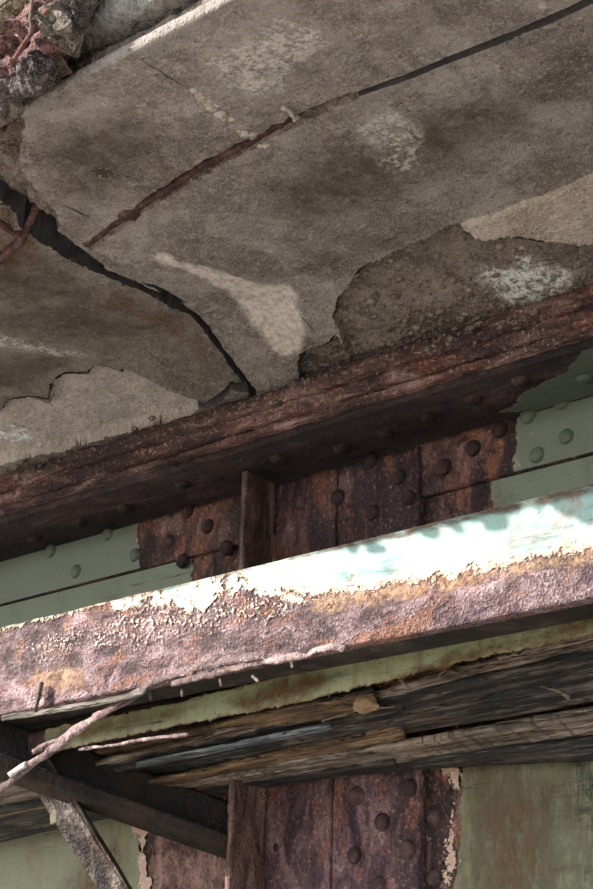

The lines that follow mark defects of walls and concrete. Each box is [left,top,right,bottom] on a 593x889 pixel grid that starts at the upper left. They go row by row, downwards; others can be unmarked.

crack [359,0,593,96]
crack [0,179,256,409]
efflorescence [153,252,305,355]
spalling [238,173,593,409]
peeling [0,348,593,671]
rust [313,562,536,612]
rust [285,484,593,559]
rust [549,548,593,565]
peeling [44,619,593,751]
peeling [442,761,593,889]